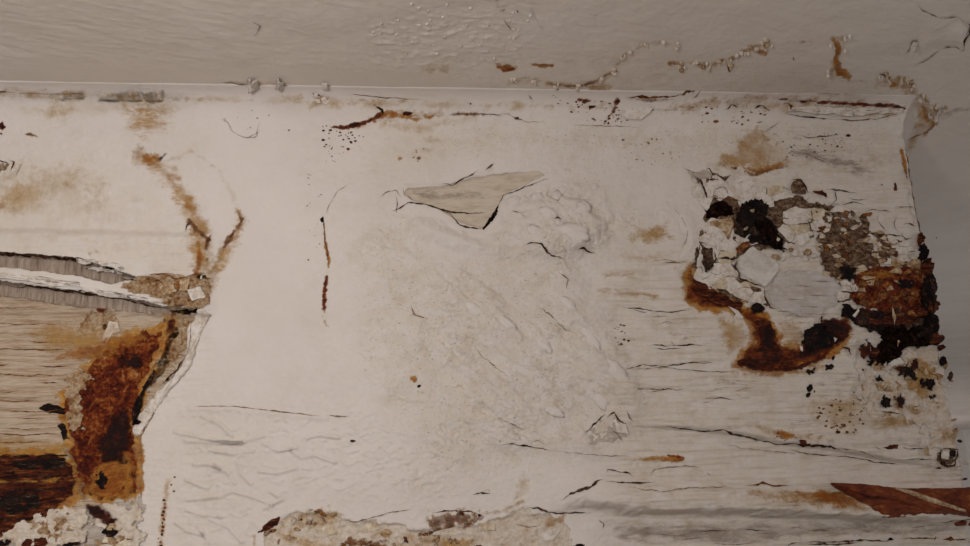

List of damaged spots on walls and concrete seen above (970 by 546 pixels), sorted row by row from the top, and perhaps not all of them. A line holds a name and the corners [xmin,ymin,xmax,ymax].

spalling [0,160,21,174]
rust [321,94,434,157]
spalling [382,164,544,230]
damp [722,131,851,176]
rust [682,264,852,377]
crack [627,308,746,403]
spalling [0,273,212,546]
rust [46,308,178,505]
crack [501,440,725,499]
crack [668,426,901,465]
spalling [258,507,585,546]
rust [746,481,970,526]